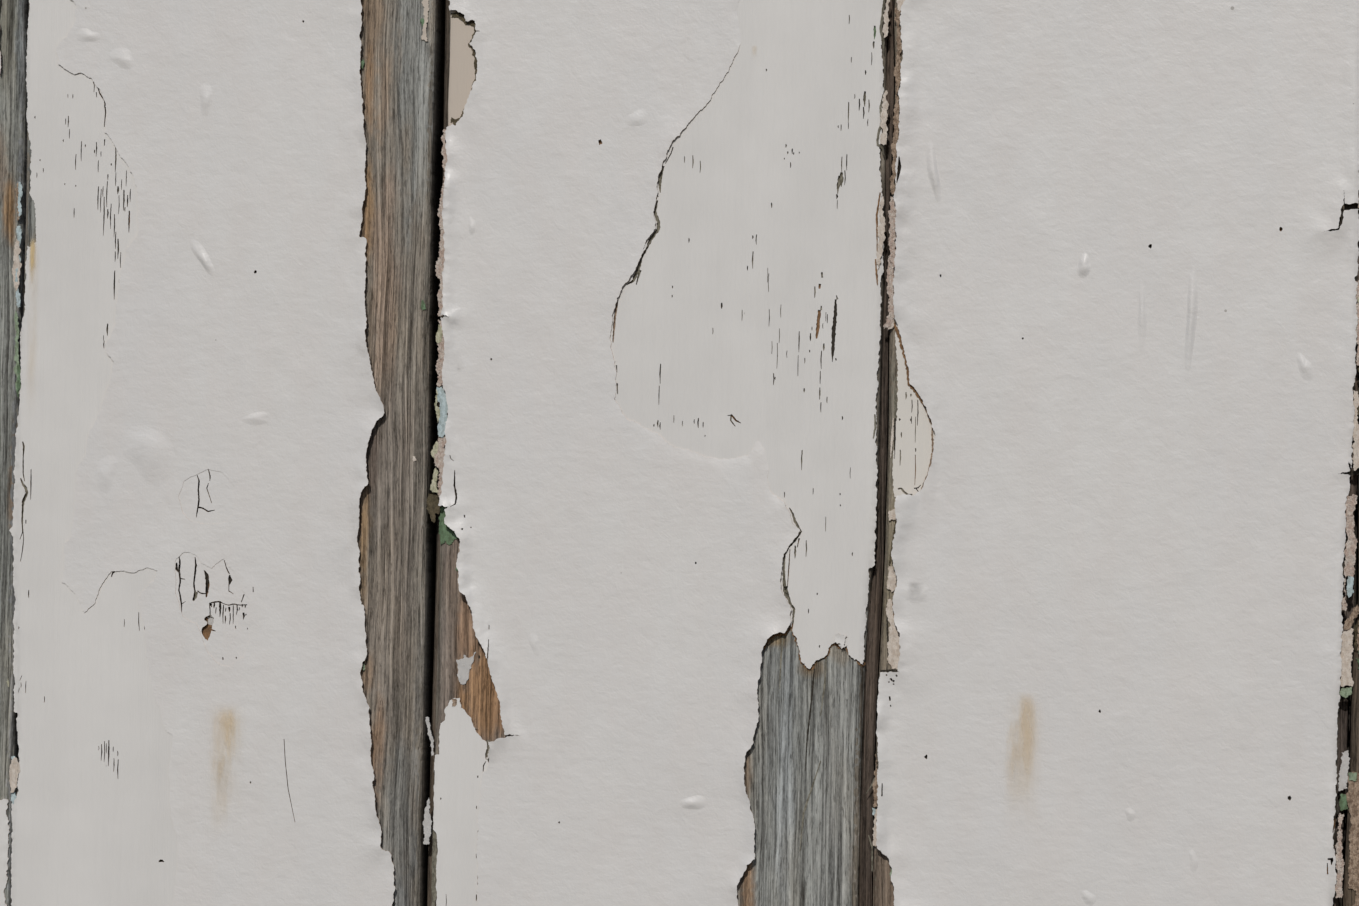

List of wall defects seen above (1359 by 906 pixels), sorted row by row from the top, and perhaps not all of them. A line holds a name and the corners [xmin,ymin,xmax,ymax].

crack [613,148,673,394]
peeling [0,0,178,906]
crack [196,472,214,517]
peeling [178,469,237,524]
peeling [175,552,251,666]
crack [176,556,254,606]
peeling [357,0,505,906]
peeling [610,0,935,906]
peeling [1335,494,1359,906]